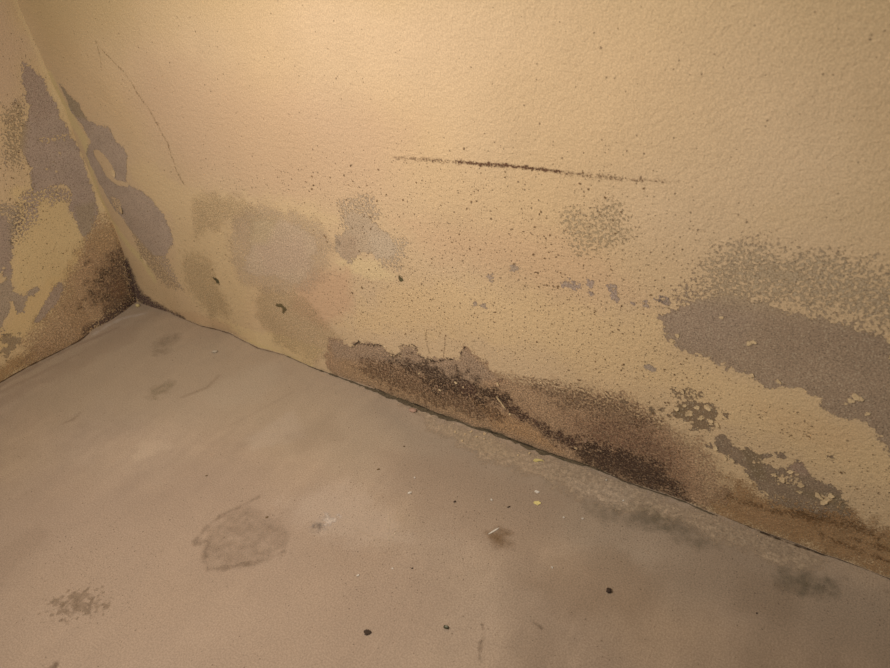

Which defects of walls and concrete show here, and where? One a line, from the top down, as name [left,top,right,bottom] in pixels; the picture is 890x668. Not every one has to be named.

peeling [0,59,182,358]
damp [0,215,185,382]
peeling [334,193,409,282]
peeling [560,278,594,296]
peeling [606,230,890,457]
damp [257,288,822,570]
peeling [647,387,855,518]